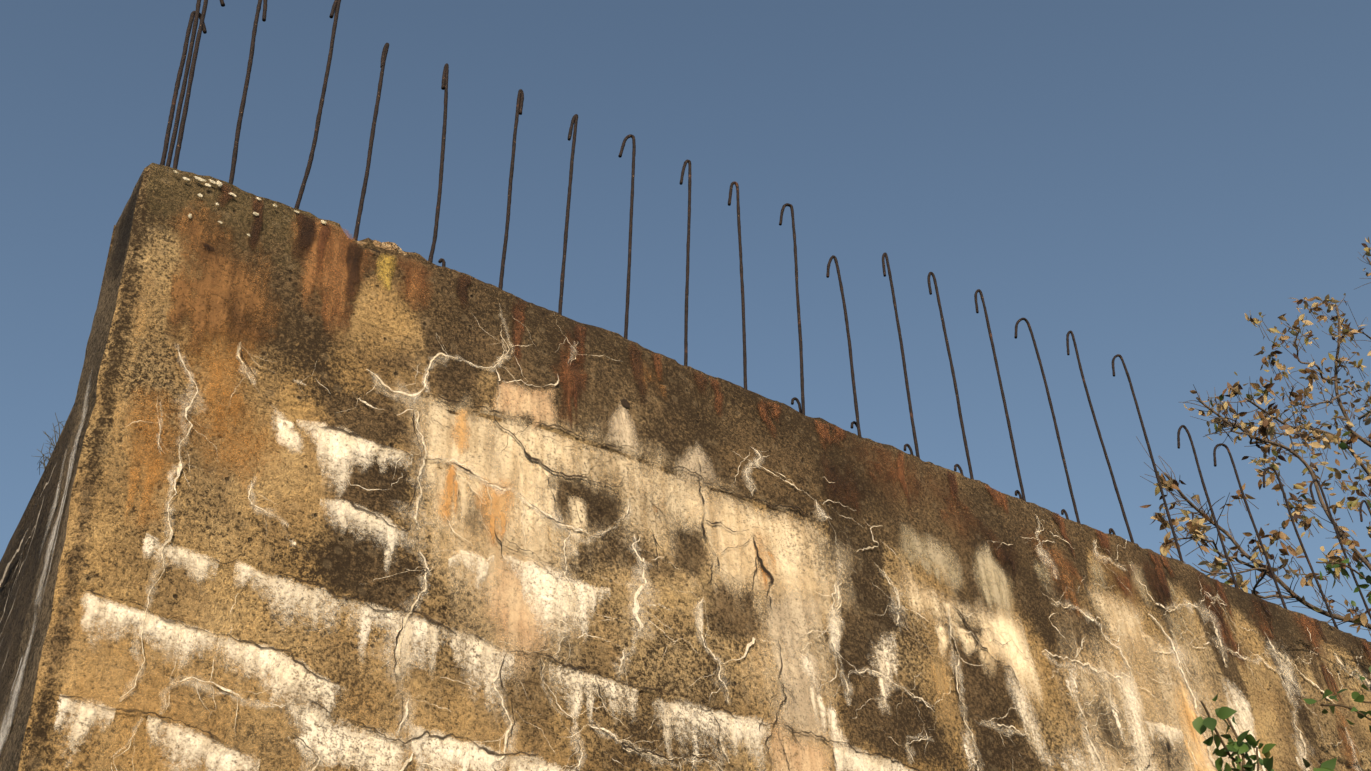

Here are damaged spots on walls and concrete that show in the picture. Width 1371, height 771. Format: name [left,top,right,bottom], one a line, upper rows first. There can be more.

rust [168,180,278,357]
rust [294,213,368,325]
crack [0,466,55,671]
damp [82,594,562,771]
damp [277,414,404,481]
damp [424,384,913,771]
crack [111,304,1371,771]
rust [815,420,846,444]
rust [985,485,1009,511]
damp [905,536,1100,771]
rust [1144,552,1173,604]
damp [1112,677,1266,771]